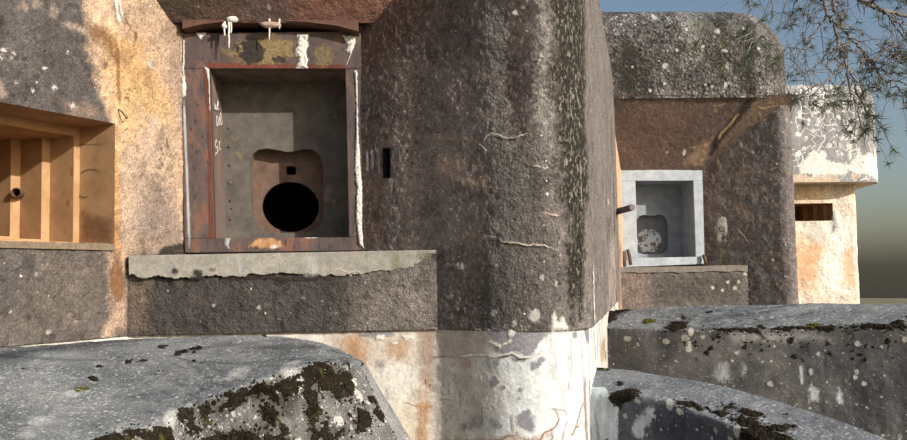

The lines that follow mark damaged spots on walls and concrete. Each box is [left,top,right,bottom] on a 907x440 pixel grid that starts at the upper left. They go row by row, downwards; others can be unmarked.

peeling [223,33,295,65]
crack [770,84,878,181]
corrosion [205,63,346,239]
water stain [494,0,619,440]
corrosion [249,238,282,250]
crack [489,236,555,250]
spalling [807,211,857,268]
corrosion [110,261,125,300]
crack [436,351,541,360]
crack [498,414,516,440]
crack [539,404,583,440]
water stain [632,406,656,439]